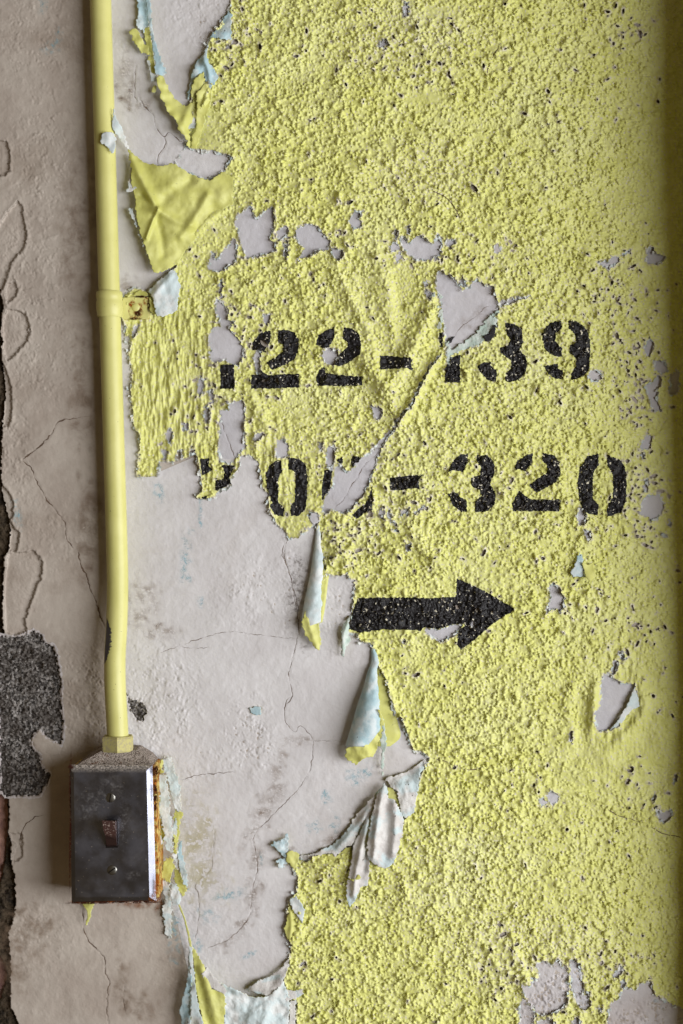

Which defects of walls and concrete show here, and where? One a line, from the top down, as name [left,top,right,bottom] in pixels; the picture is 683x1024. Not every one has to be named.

peeling [100,0,344,376]
peeling [348,210,364,230]
spalling [0,201,67,1024]
crack [23,416,105,626]
crack [168,540,324,947]
peeling [121,225,531,1024]
peeling [594,650,639,732]
peeling [516,958,683,1024]